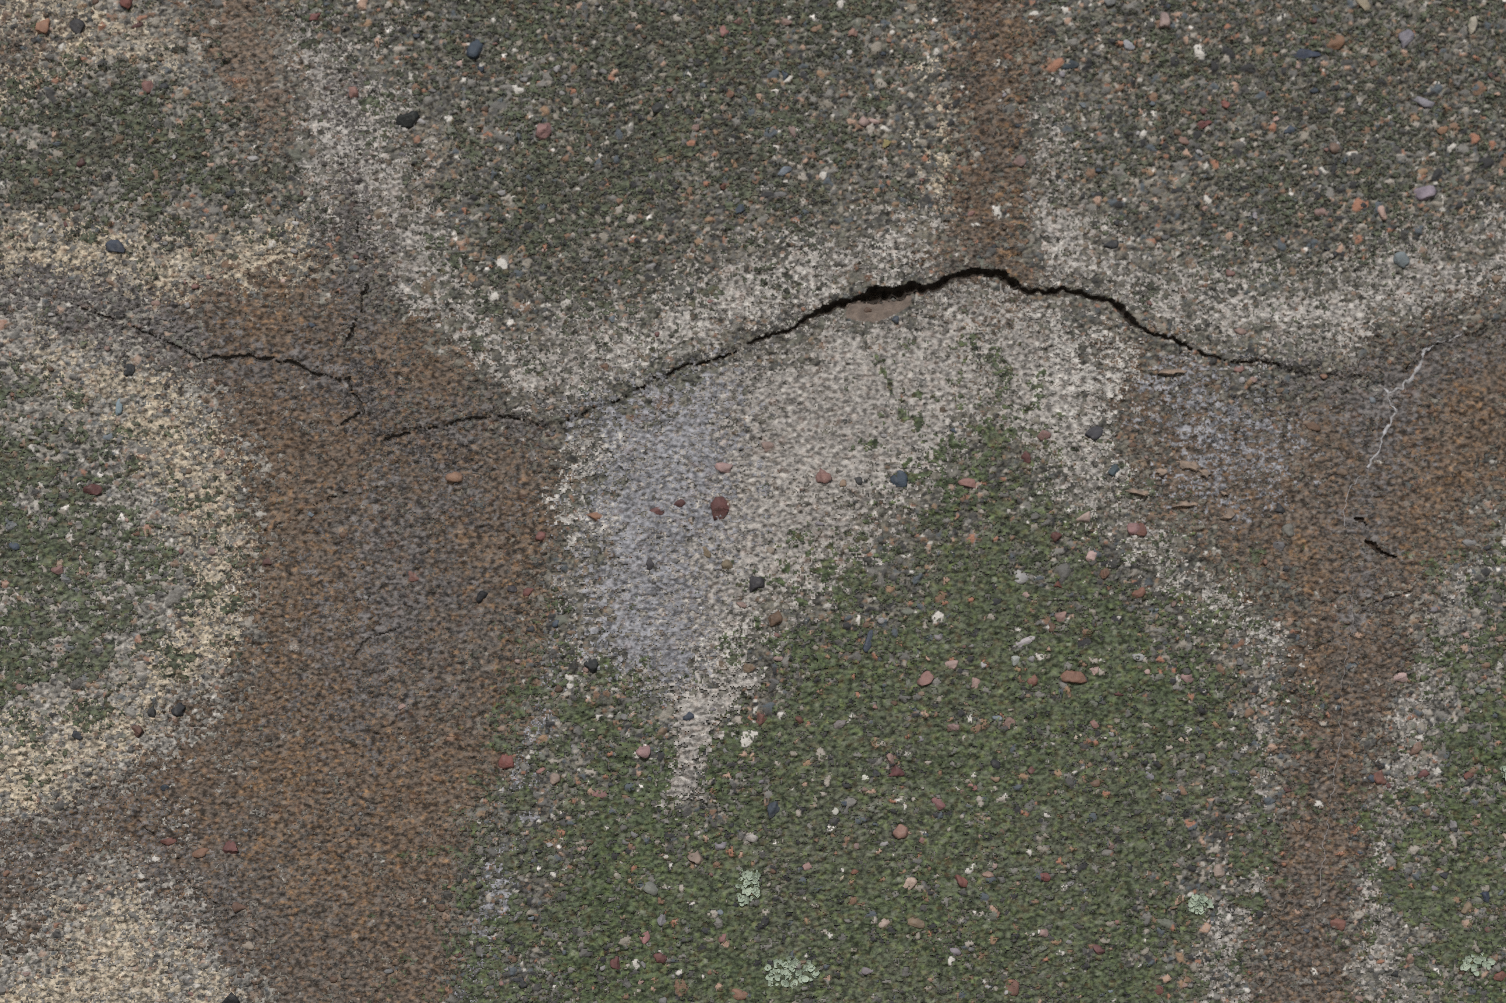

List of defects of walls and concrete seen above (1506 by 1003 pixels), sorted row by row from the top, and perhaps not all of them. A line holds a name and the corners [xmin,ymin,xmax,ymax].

crack [71,221,1506,938]